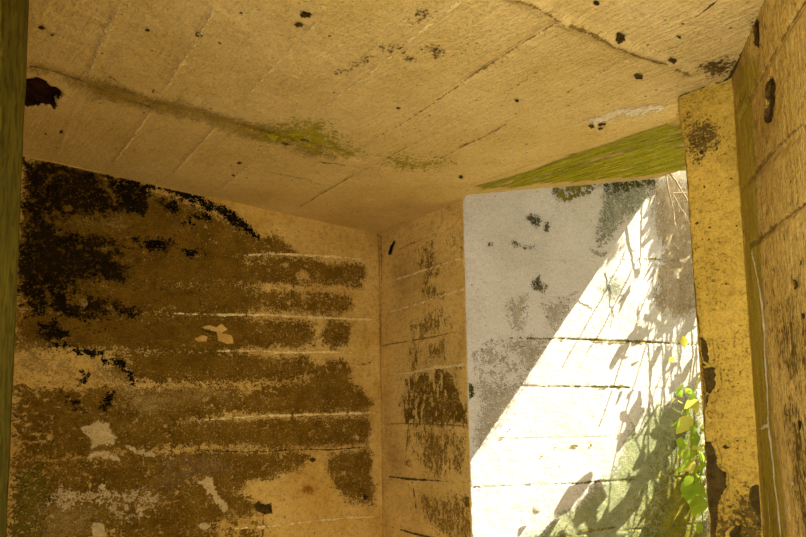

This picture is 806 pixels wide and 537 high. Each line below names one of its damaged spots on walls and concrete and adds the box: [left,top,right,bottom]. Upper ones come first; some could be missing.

spalling [25,77,62,109]
damp [66,77,326,156]
damp [14,156,260,461]
peeling [7,158,377,537]
spalling [700,337,716,418]
damp [28,444,236,537]
spalling [705,441,741,537]
spalling [747,485,762,528]